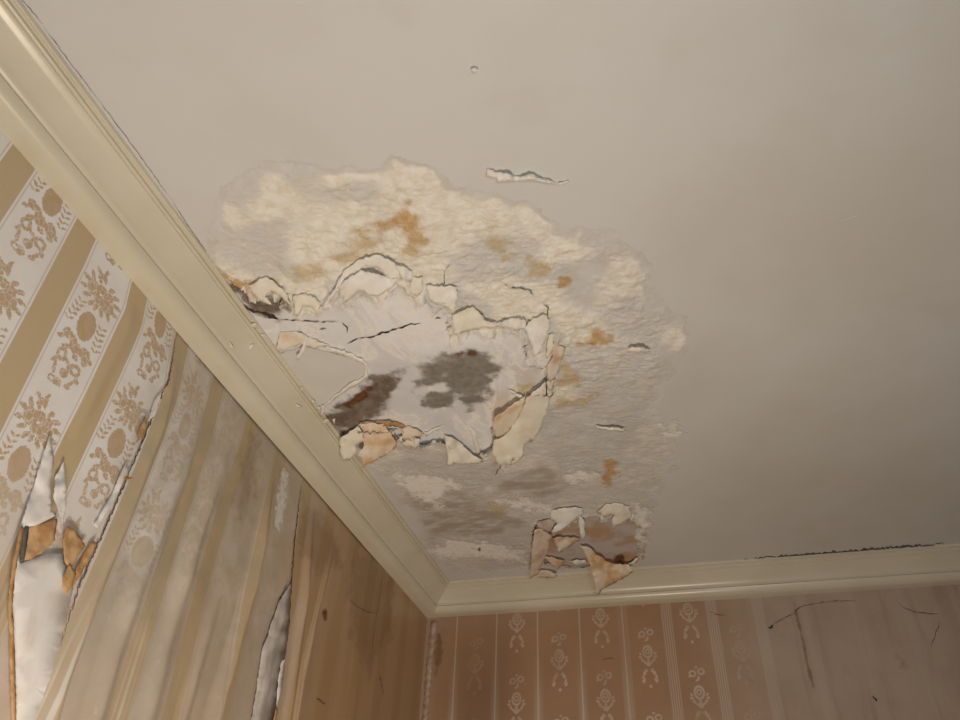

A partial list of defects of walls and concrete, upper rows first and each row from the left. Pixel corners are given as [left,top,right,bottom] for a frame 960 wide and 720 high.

leakage [323,375,401,440]
peeling [227,254,566,475]
leakage [415,350,501,412]
leakage [388,468,465,510]
flaking render [20,519,85,567]
leakage [425,539,528,563]
peeling [530,503,647,595]
leakage [630,502,653,556]
crack [769,600,849,629]